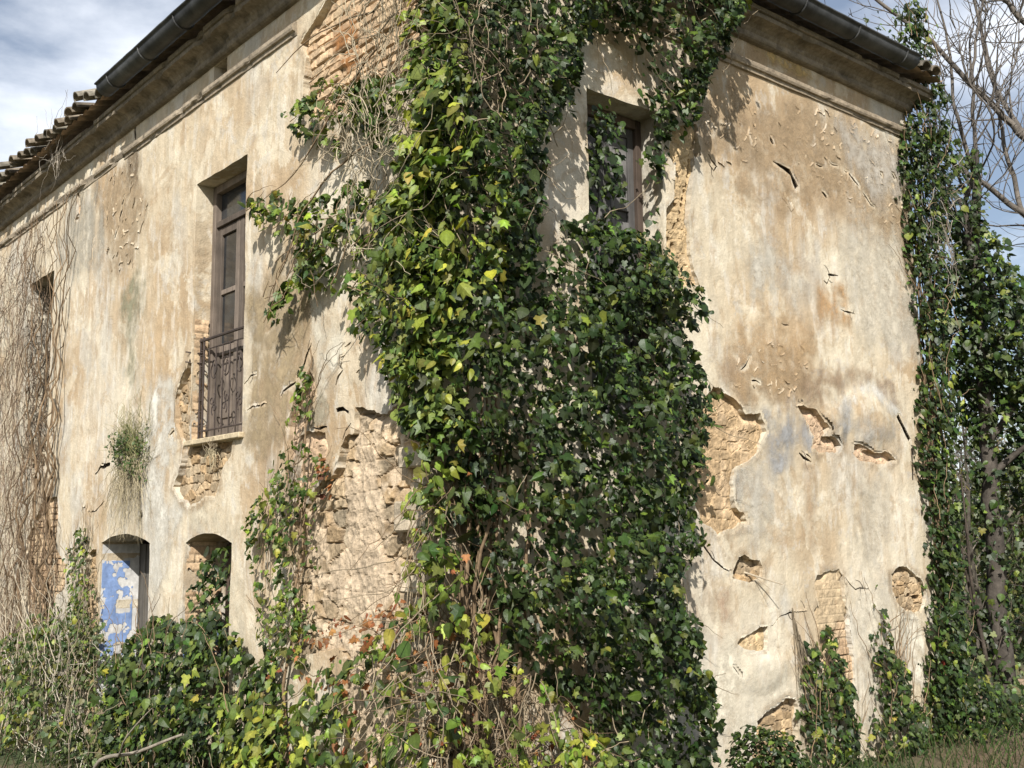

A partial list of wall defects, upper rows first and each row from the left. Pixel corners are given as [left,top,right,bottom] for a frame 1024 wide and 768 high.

flaking render [306,0,428,121]
flaking render [191,319,209,440]
spalling [690,338,836,534]
water stain [802,372,901,434]
spalling [852,445,893,464]
peeling [87,552,133,737]
spalling [732,557,760,583]
spalling [737,623,768,651]
flaking render [813,569,853,722]
flaking render [891,567,924,612]